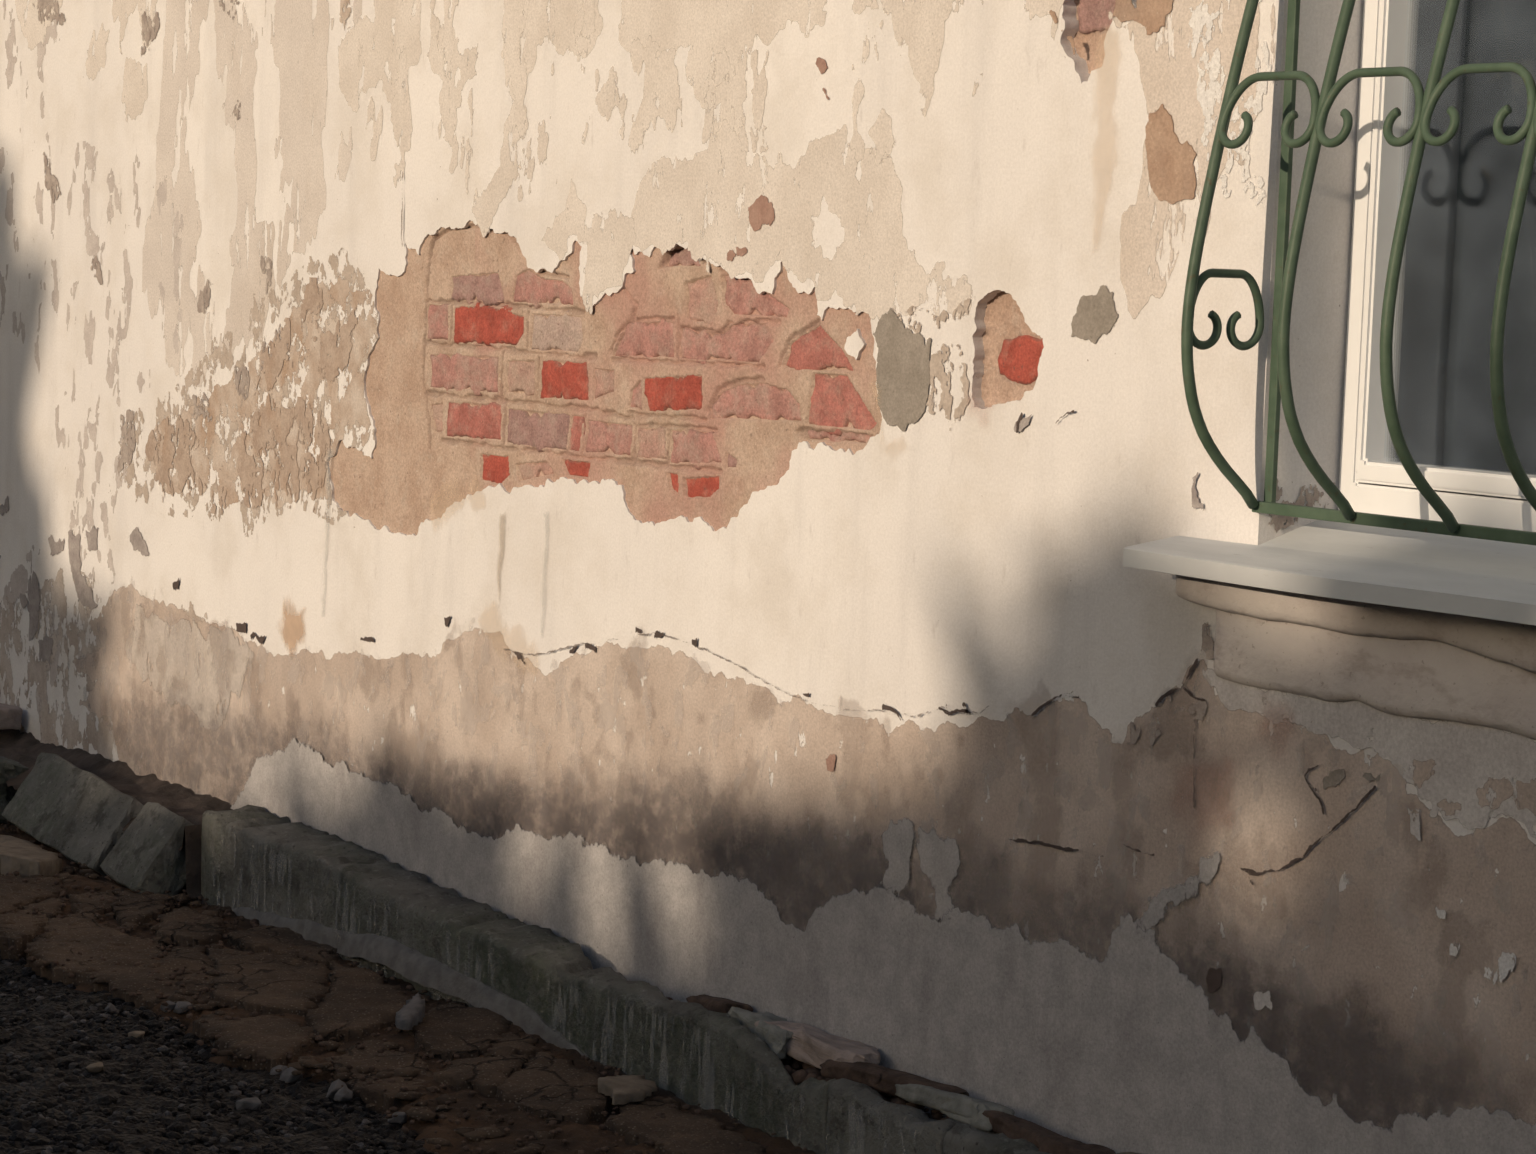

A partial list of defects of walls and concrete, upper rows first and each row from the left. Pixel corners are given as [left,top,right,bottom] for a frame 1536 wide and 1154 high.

peeling [3,0,63,155]
peeling [0,147,19,252]
peeling [34,182,55,238]
peeling [40,259,95,365]
flaking render [67,0,973,541]
flaking render [926,291,1044,431]
peeling [1024,0,1275,344]
damp [119,709,932,930]
flaking render [0,545,1536,1132]
crack [1010,838,1154,857]
crack [1241,765,1376,885]
damp [1159,947,1471,1127]